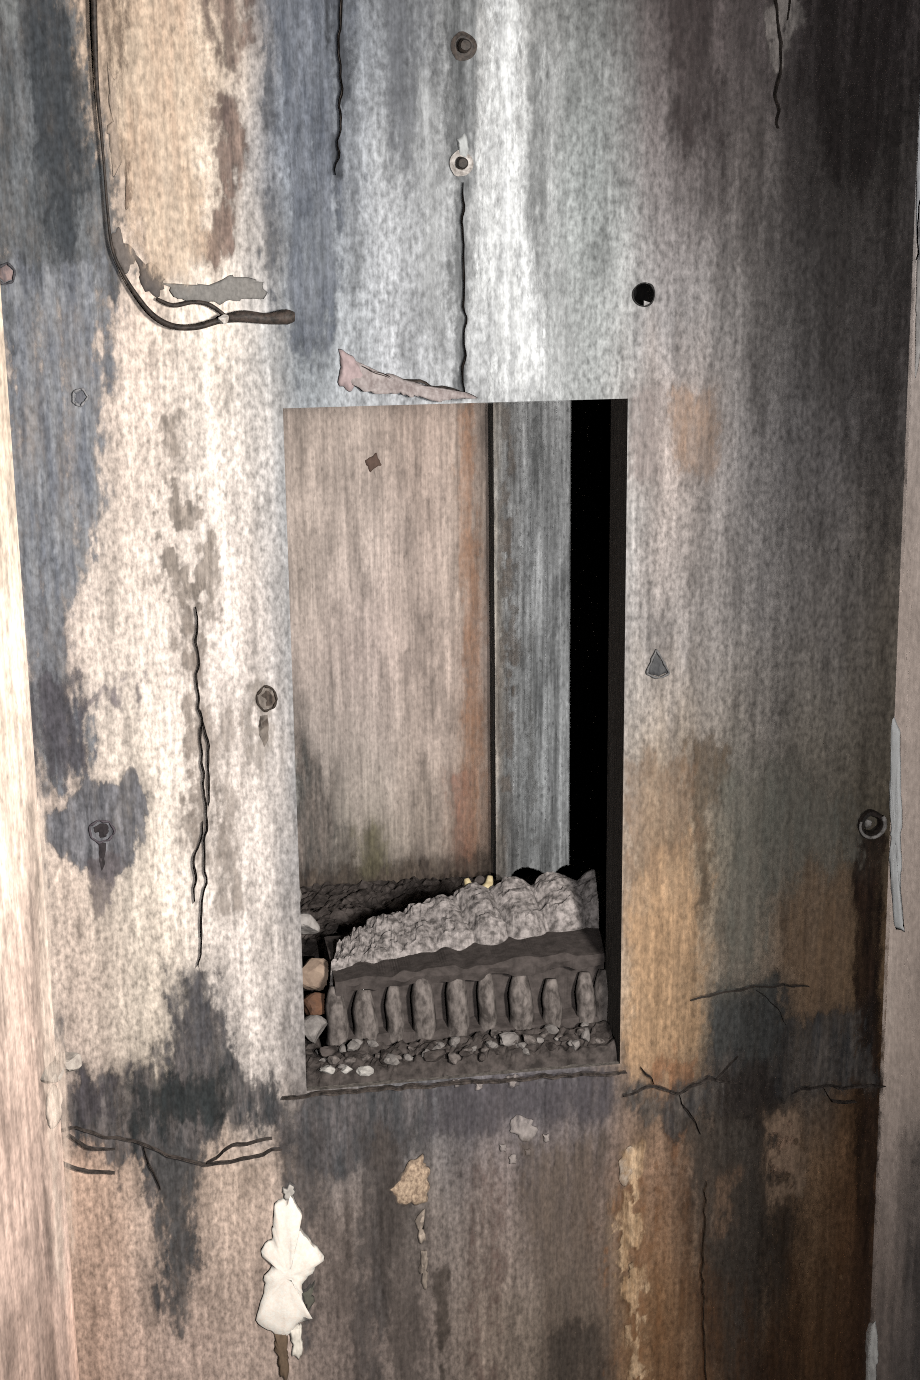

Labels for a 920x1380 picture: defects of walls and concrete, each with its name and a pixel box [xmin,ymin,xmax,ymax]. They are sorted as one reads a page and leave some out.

spalling [107,0,268,305]
water stain [203,0,359,371]
crack [334,0,344,175]
water stain [389,0,566,502]
water stain [0,0,149,904]
water stain [144,410,242,914]
crack [193,609,210,967]
crack [61,1126,282,1190]
peeling [255,1185,325,1380]
peeling [390,1153,430,1290]
water stain [39,863,878,1380]
crack [282,1055,745,1134]